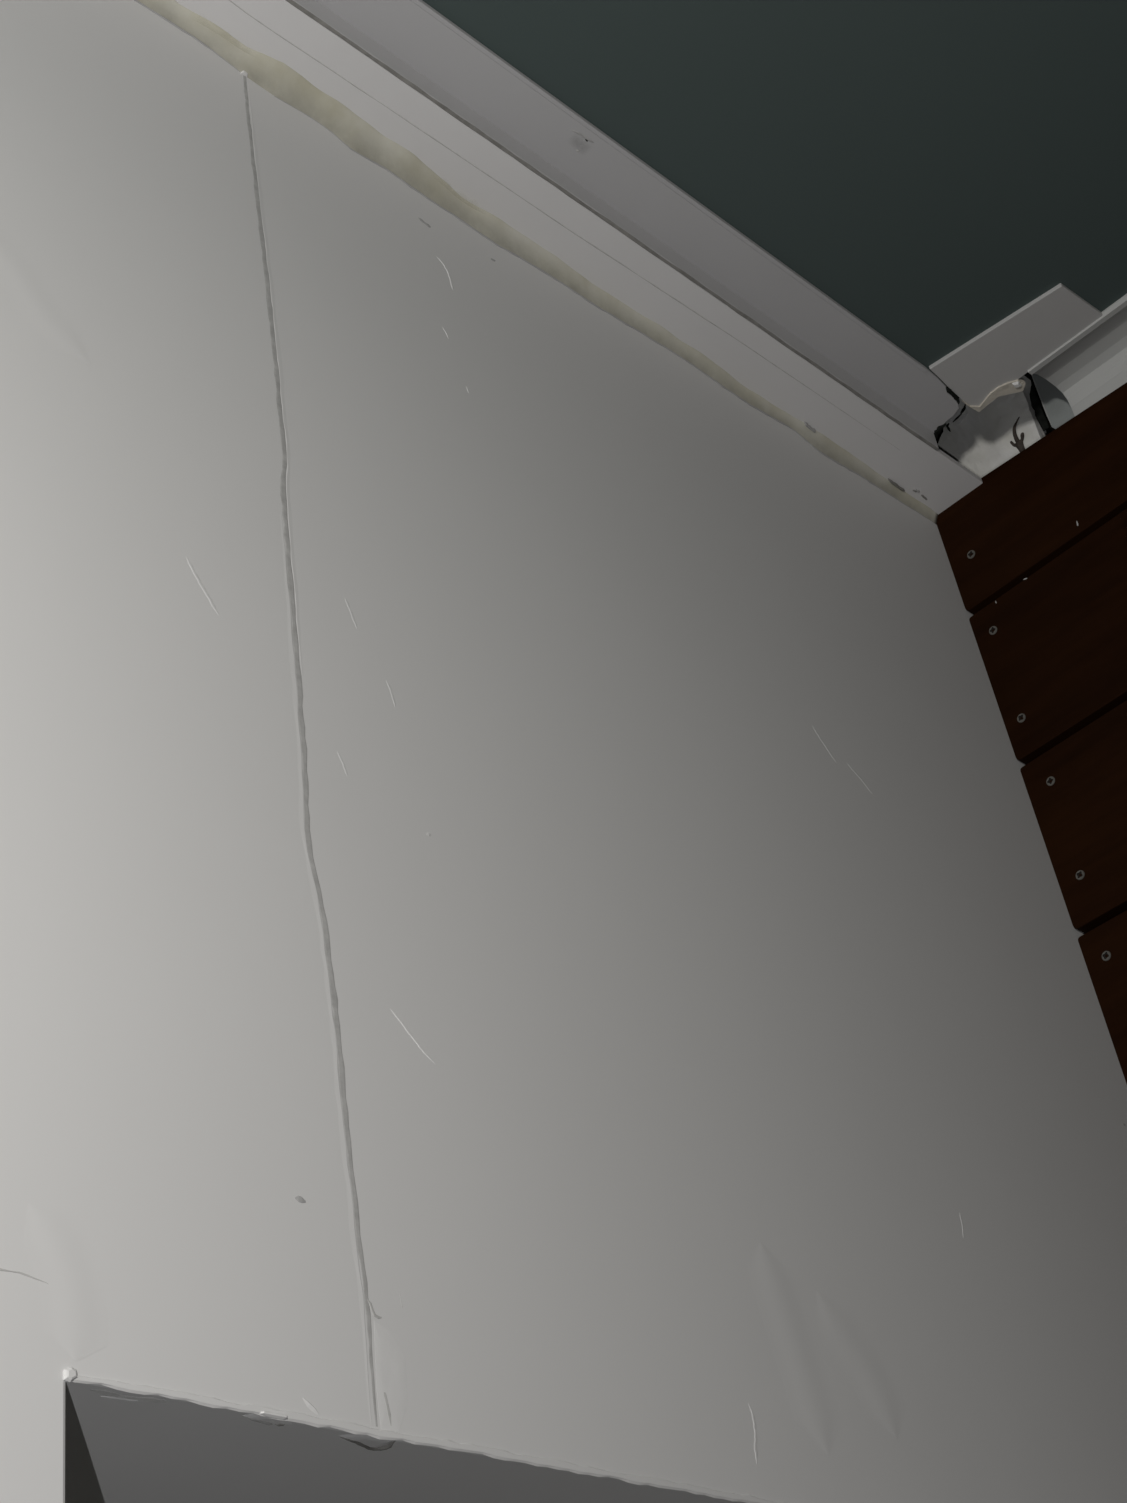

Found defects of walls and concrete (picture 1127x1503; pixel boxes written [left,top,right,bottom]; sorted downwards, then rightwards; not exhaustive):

flaking render [938,375,1047,478]
crack [134,0,934,1431]
crack [0,1268,48,1284]